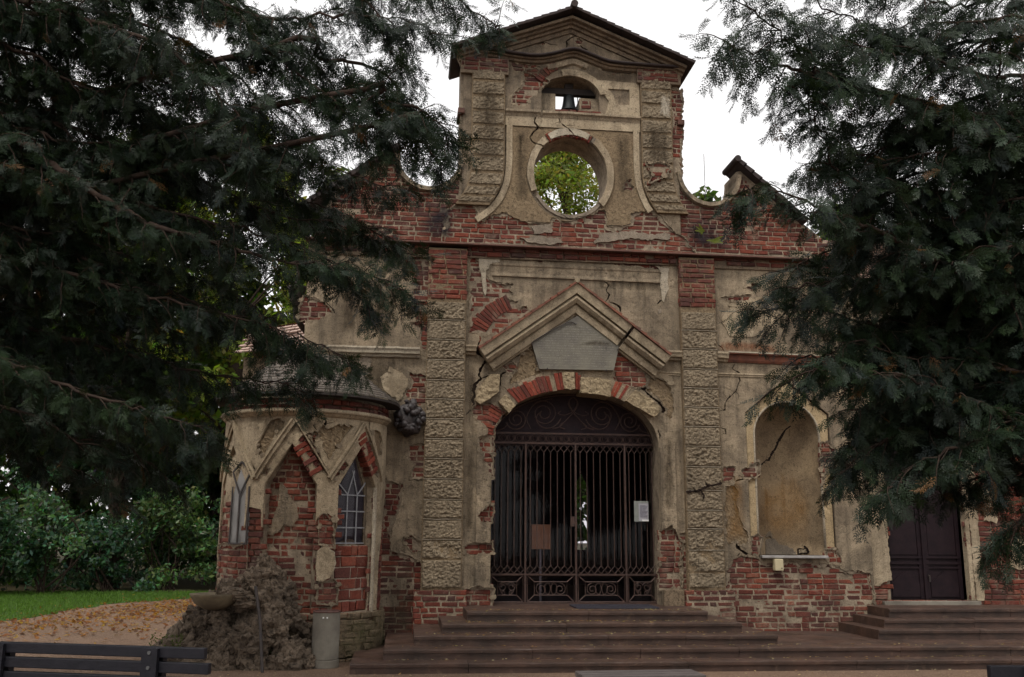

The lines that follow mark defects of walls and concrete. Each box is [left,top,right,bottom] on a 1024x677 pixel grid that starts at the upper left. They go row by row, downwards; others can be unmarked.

spalling [643,88,684,186]
spalling [440,204,697,253]
spalling [467,258,560,342]
crack [466,342,520,415]
spalling [501,347,545,385]
crack [719,343,742,434]
spalling [246,418,285,476]
spalling [298,423,354,481]
crack [686,426,791,501]
spalling [365,430,424,642]
spalling [656,525,687,592]
spalling [721,459,877,631]